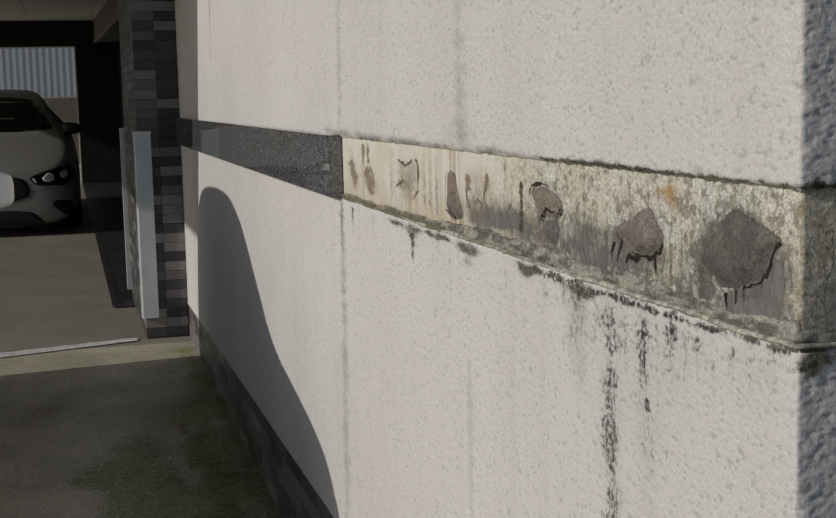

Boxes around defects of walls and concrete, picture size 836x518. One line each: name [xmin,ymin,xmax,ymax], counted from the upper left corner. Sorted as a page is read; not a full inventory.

water stain [348,143,375,194]
water stain [469,181,534,240]
water stain [694,250,791,325]
water stain [536,269,681,387]
water stain [695,322,790,354]
water stain [601,368,618,518]